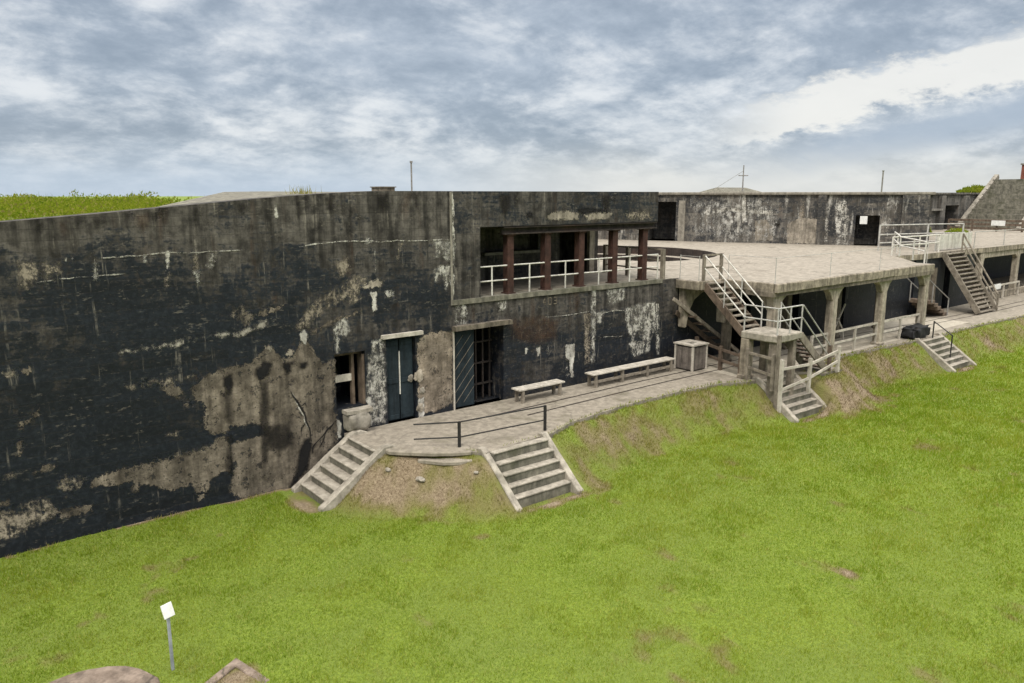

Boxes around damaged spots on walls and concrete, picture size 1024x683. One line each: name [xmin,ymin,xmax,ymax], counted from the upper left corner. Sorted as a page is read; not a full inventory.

damp [695,195,780,239]
damp [825,201,849,245]
damp [349,291,391,312]
damp [334,319,348,353]
spalling [59,258,366,501]
damp [224,375,233,418]
damp [256,362,312,489]
crack [291,392,335,453]
peeling [366,340,386,424]
spalling [408,331,453,417]